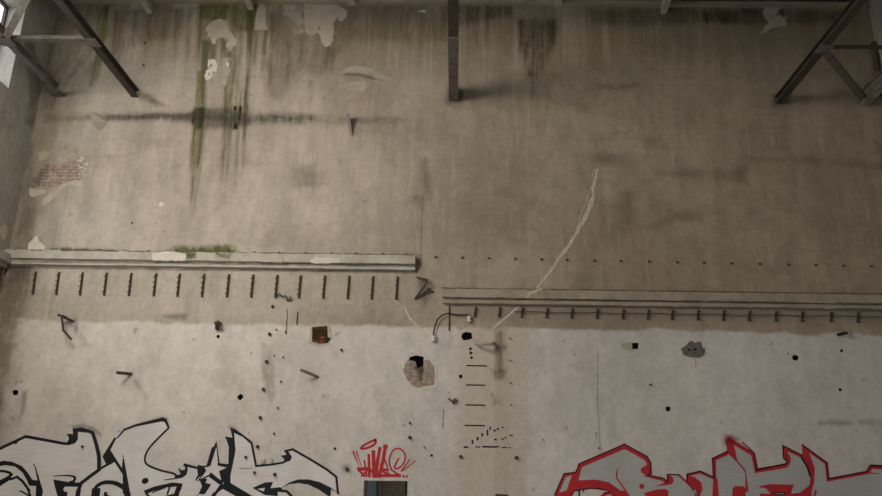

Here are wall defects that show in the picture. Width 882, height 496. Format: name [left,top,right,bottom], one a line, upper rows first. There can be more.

peeling [204,19,237,86]
water stain [248,6,257,48]
peeling [282,5,347,47]
water stain [191,13,235,164]
spalling [29,143,89,206]
crack [491,169,599,330]
spalling [310,323,332,346]
spalling [403,350,438,390]